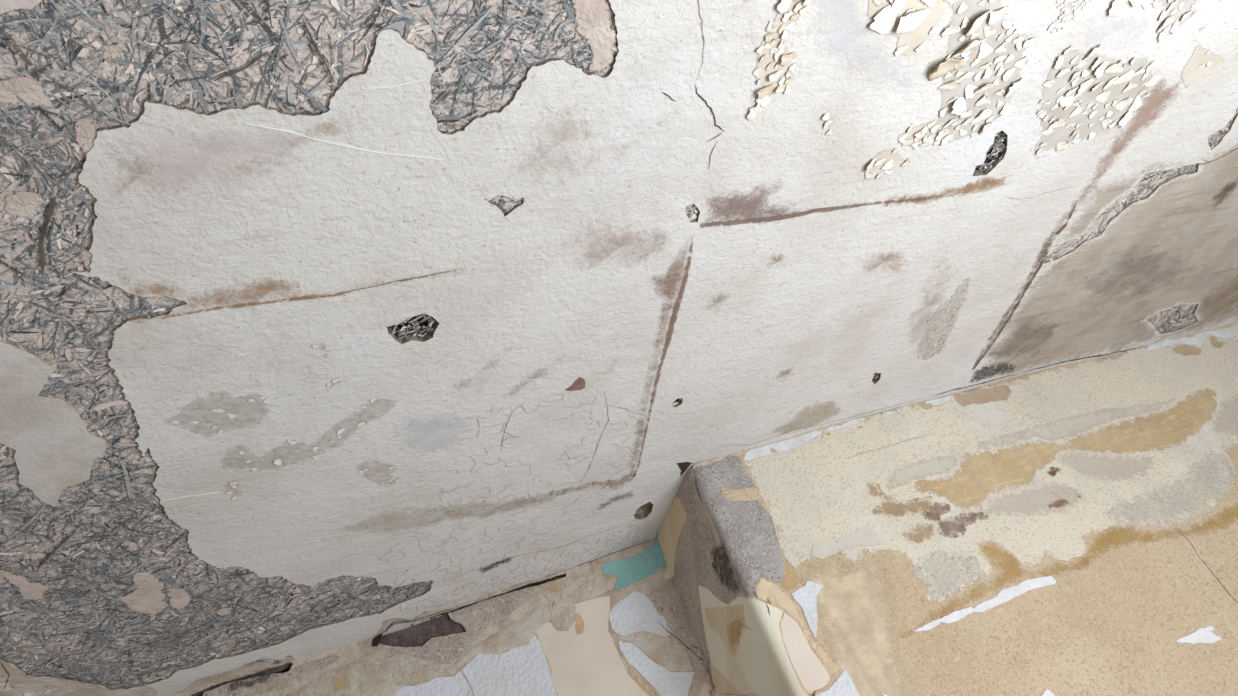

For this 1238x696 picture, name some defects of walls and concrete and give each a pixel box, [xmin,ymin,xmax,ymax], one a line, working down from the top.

crack [663,0,725,165]
peeling [747,0,813,121]
peeling [865,0,1093,179]
peeling [1034,45,1159,156]
flaking render [1208,108,1238,149]
corrosion [885,178,1004,205]
damp [971,80,1238,382]
flaking render [1044,163,1200,263]
flaking render [0,0,619,696]
peeling [617,455,841,675]
damp [982,543,1022,585]
damp [1042,529,1171,576]